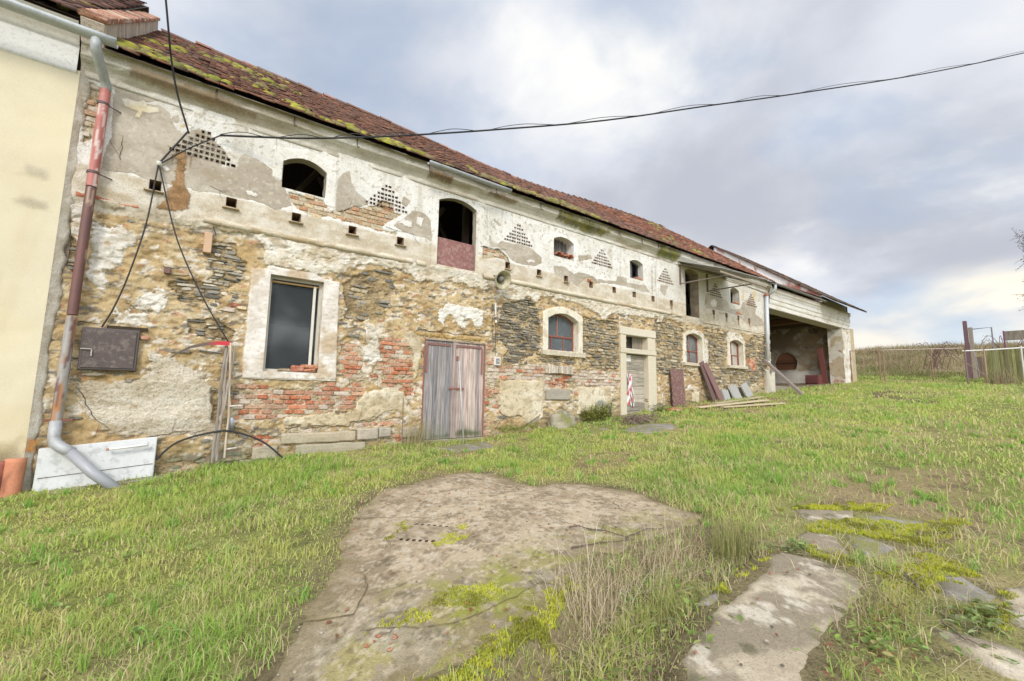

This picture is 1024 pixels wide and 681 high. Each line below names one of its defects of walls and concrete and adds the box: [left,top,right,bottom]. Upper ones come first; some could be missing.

peeling [101,88,432,245]
peeling [70,191,145,294]
peeling [112,288,170,328]
peeling [165,215,678,323]
flaking render [227,323,422,447]